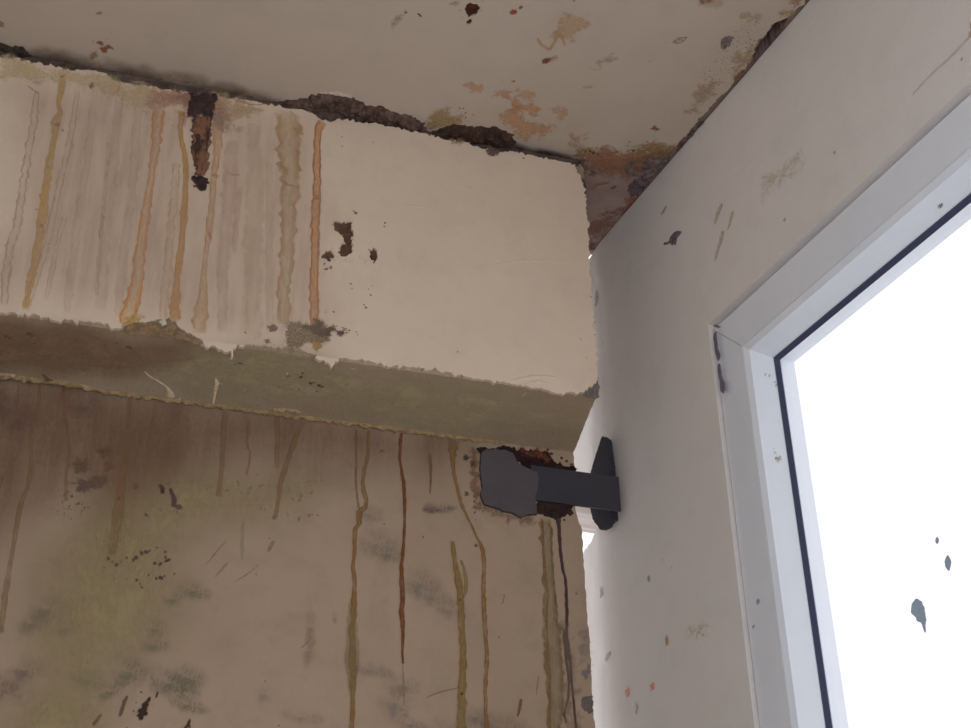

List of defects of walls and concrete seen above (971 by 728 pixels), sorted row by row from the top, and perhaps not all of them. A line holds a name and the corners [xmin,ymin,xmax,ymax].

peeling [459,1,484,23]
spalling [278,91,516,149]
rust [120,87,260,332]
rust [309,121,325,324]
spalling [321,210,358,270]
mould [264,318,358,353]
damp [0,385,257,519]
damp [103,547,175,588]
rust [348,432,383,728]
rust [398,433,407,664]
rust [448,444,489,728]
damp [119,673,200,721]